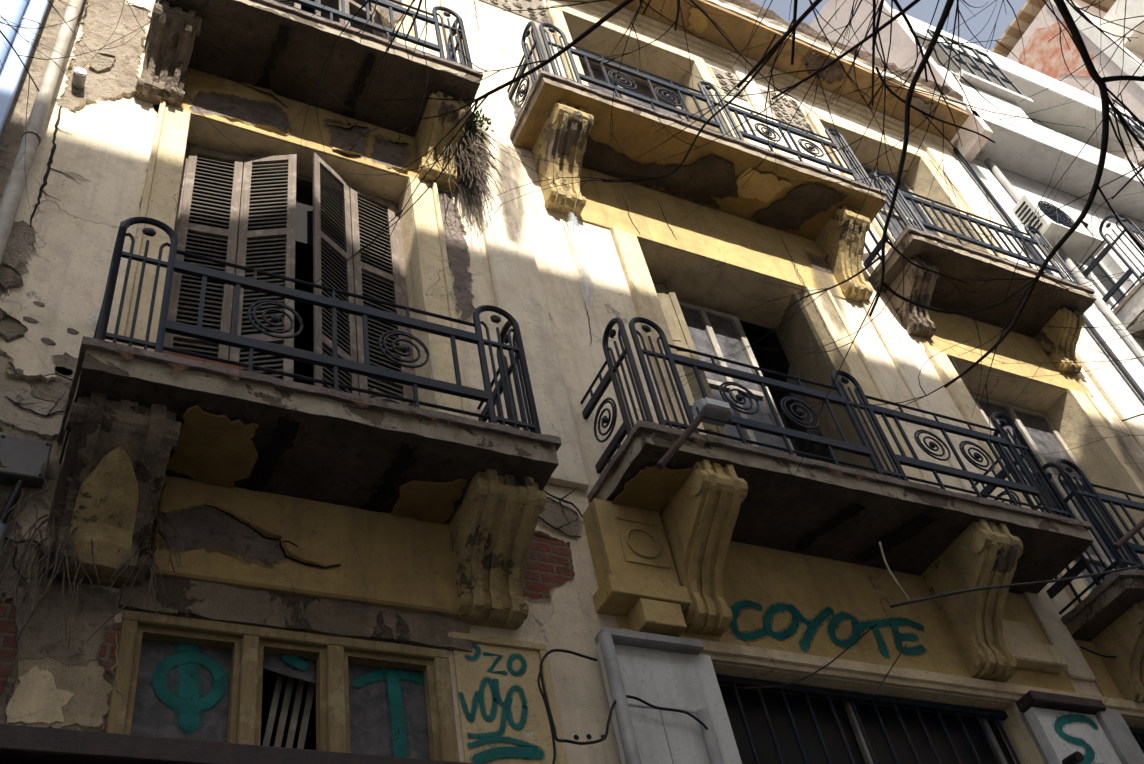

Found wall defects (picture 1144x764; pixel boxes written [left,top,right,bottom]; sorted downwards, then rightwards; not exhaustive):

peeling [53,0,151,113]
spalling [188,25,292,137]
crack [30,106,78,227]
spalling [582,136,847,231]
peeling [0,220,125,733]
peeling [166,405,258,488]
spalling [155,503,288,569]
flaking render [523,496,584,604]